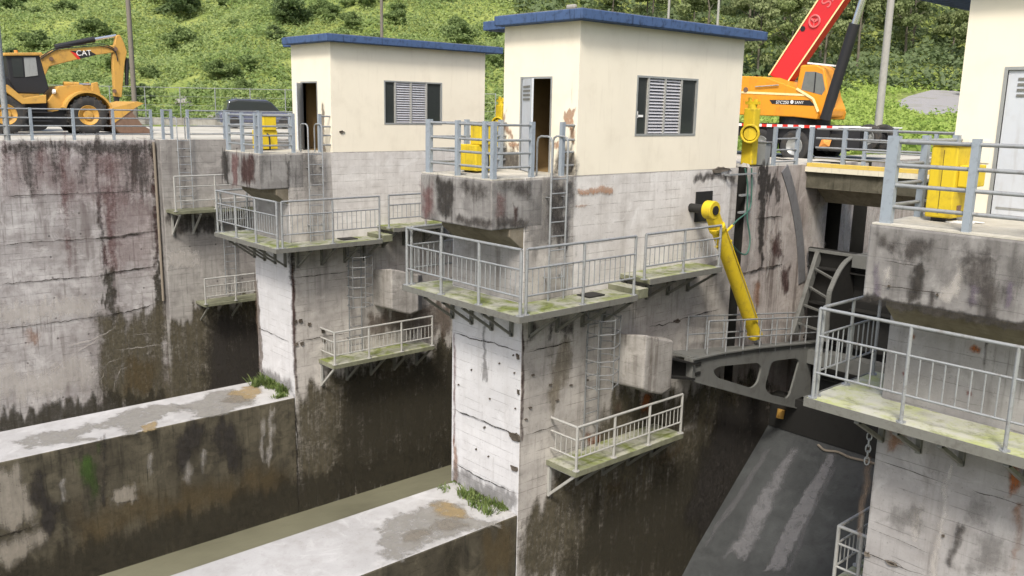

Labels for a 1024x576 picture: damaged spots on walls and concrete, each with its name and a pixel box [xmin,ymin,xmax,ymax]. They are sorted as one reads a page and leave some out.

peeling [564,108,575,144]
spalling [578,186,613,207]
damp [757,160,780,267]
damp [862,238,1024,331]
damp [0,193,260,506]
crack [456,333,576,352]
damp [0,301,452,576]
crack [455,409,557,435]
damp [519,369,770,576]